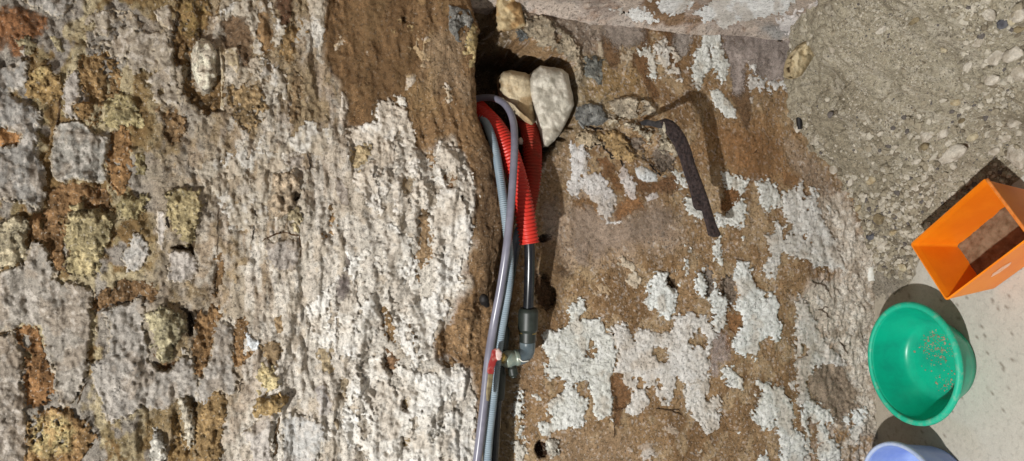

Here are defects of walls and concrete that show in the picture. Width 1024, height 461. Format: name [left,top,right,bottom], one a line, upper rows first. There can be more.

spalling [448,5,474,45]
spalling [607,96,678,173]
spalling [704,265,737,306]
spalling [536,438,560,459]